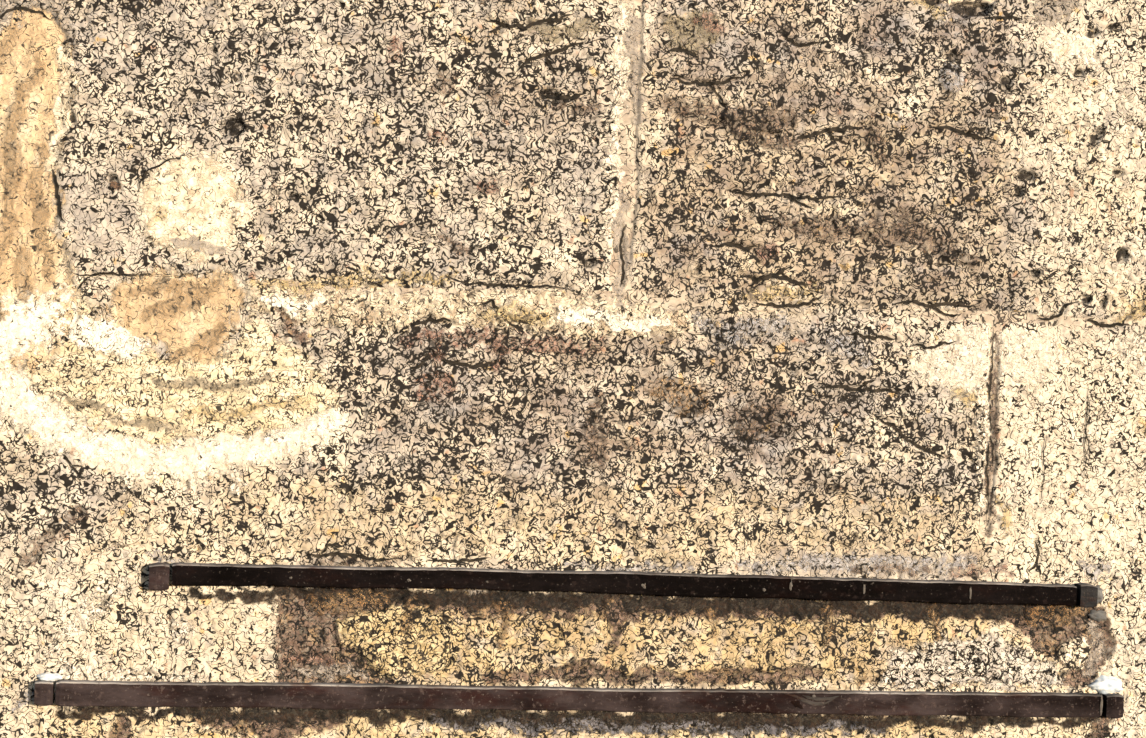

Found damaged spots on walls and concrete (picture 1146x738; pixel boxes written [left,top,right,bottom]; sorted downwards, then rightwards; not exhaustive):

crack [618,228,626,287]
crack [986,329,994,527]